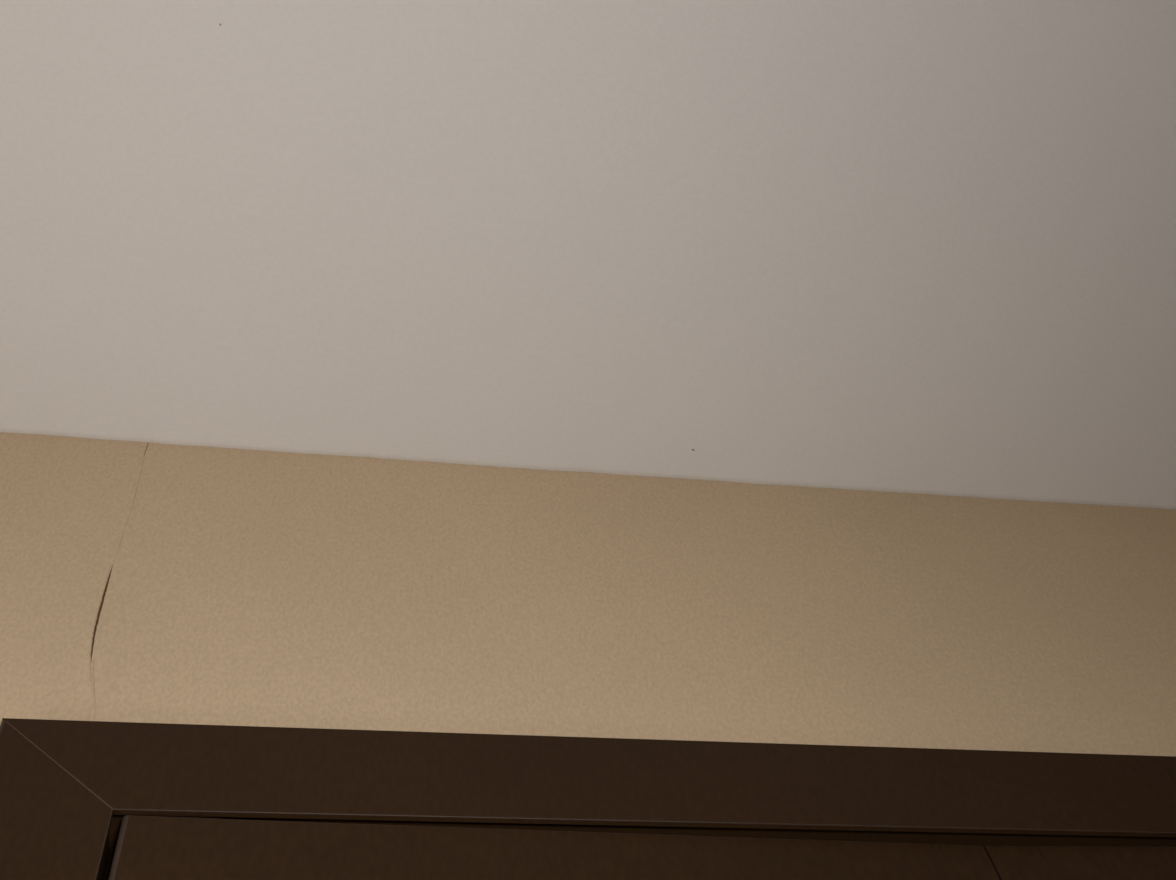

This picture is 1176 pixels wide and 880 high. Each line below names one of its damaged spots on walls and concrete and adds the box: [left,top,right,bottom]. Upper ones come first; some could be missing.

crack [88,443,149,721]